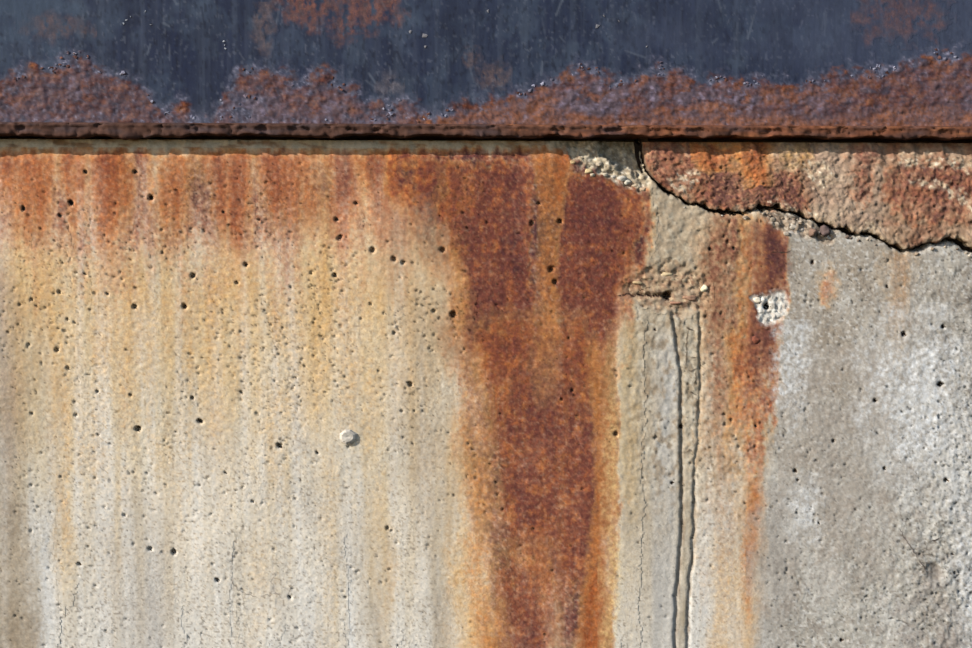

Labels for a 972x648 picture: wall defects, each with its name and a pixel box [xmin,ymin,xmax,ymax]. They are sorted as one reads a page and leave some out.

corrosion [0,0,972,126]
crack [633,138,972,258]
spalling [748,288,791,330]
corrosion [0,142,815,648]